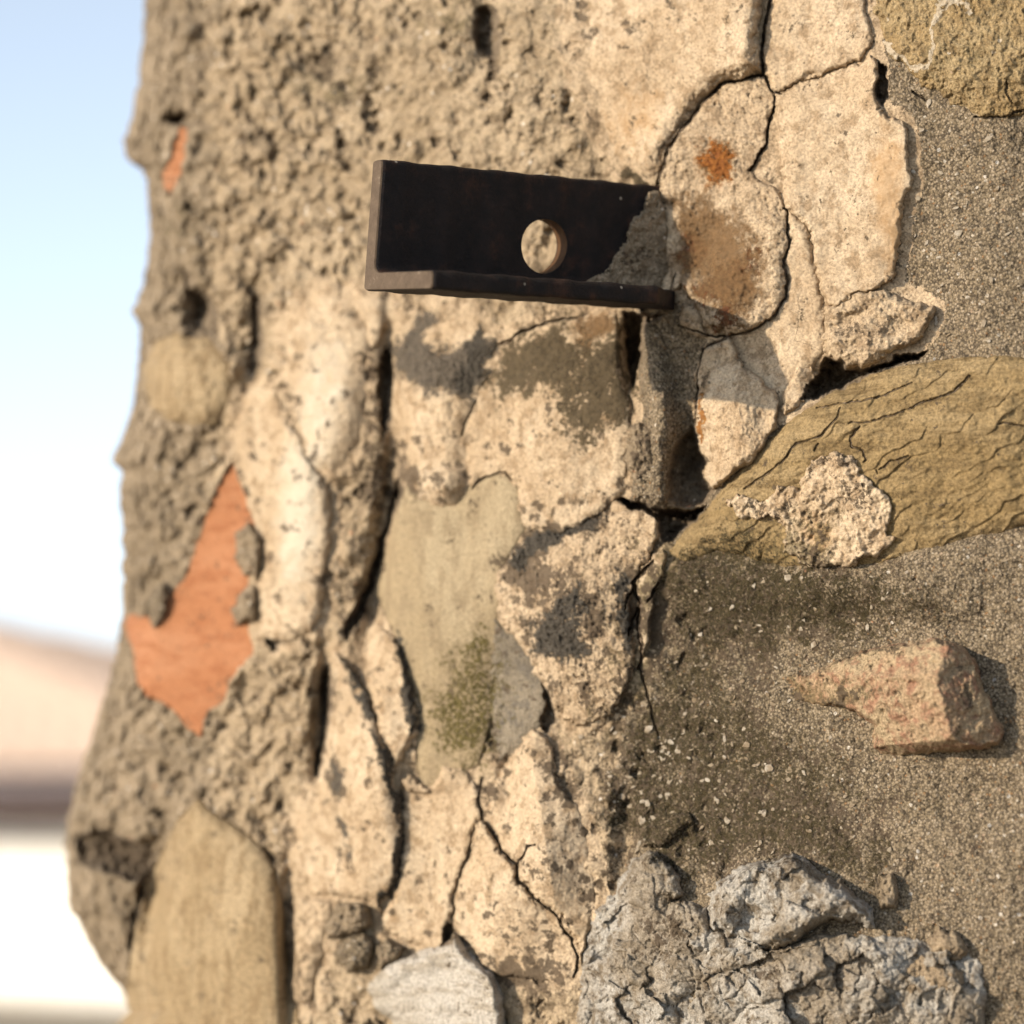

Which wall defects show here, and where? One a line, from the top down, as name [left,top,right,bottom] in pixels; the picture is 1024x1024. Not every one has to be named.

crack [657,0,780,184]
corrosion [662,137,770,336]
crack [679,208,819,422]
crack [744,376,969,489]
damp [395,622,517,779]
crack [625,561,659,737]
crack [426,778,579,975]